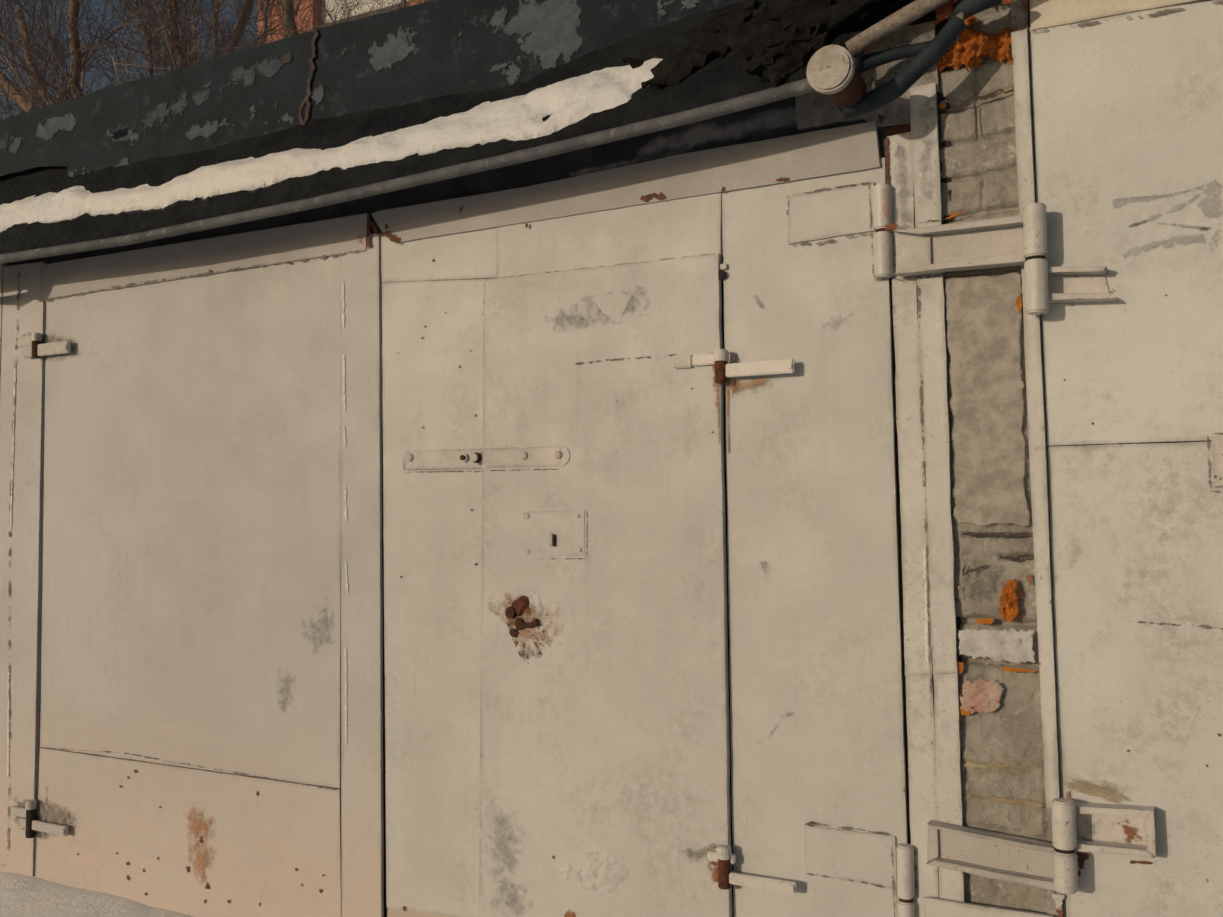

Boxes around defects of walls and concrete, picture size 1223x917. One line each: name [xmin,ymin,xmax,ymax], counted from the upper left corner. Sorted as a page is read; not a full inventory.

peeling [338,26,420,71]
peeling [486,0,583,85]
peeling [657,0,700,16]
peeling [0,113,79,154]
peeling [105,52,294,167]
peeling [310,84,332,109]
rust [496,591,550,664]
rust [188,809,211,880]